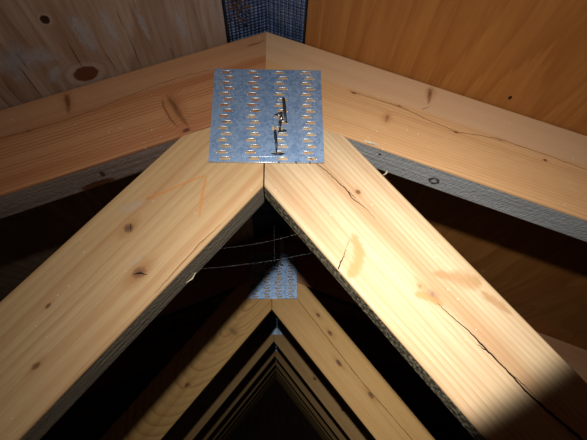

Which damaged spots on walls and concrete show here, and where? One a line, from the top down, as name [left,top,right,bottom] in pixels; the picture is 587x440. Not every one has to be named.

crack [352,91,587,170]
crack [438,303,584,440]